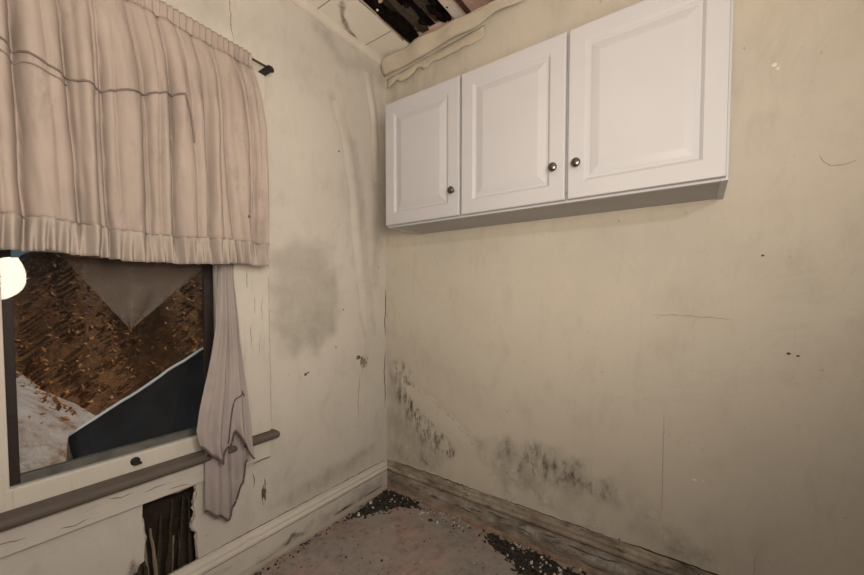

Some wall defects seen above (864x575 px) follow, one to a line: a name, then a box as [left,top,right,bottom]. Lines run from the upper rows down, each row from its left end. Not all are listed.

spalling [134,485,197,575]